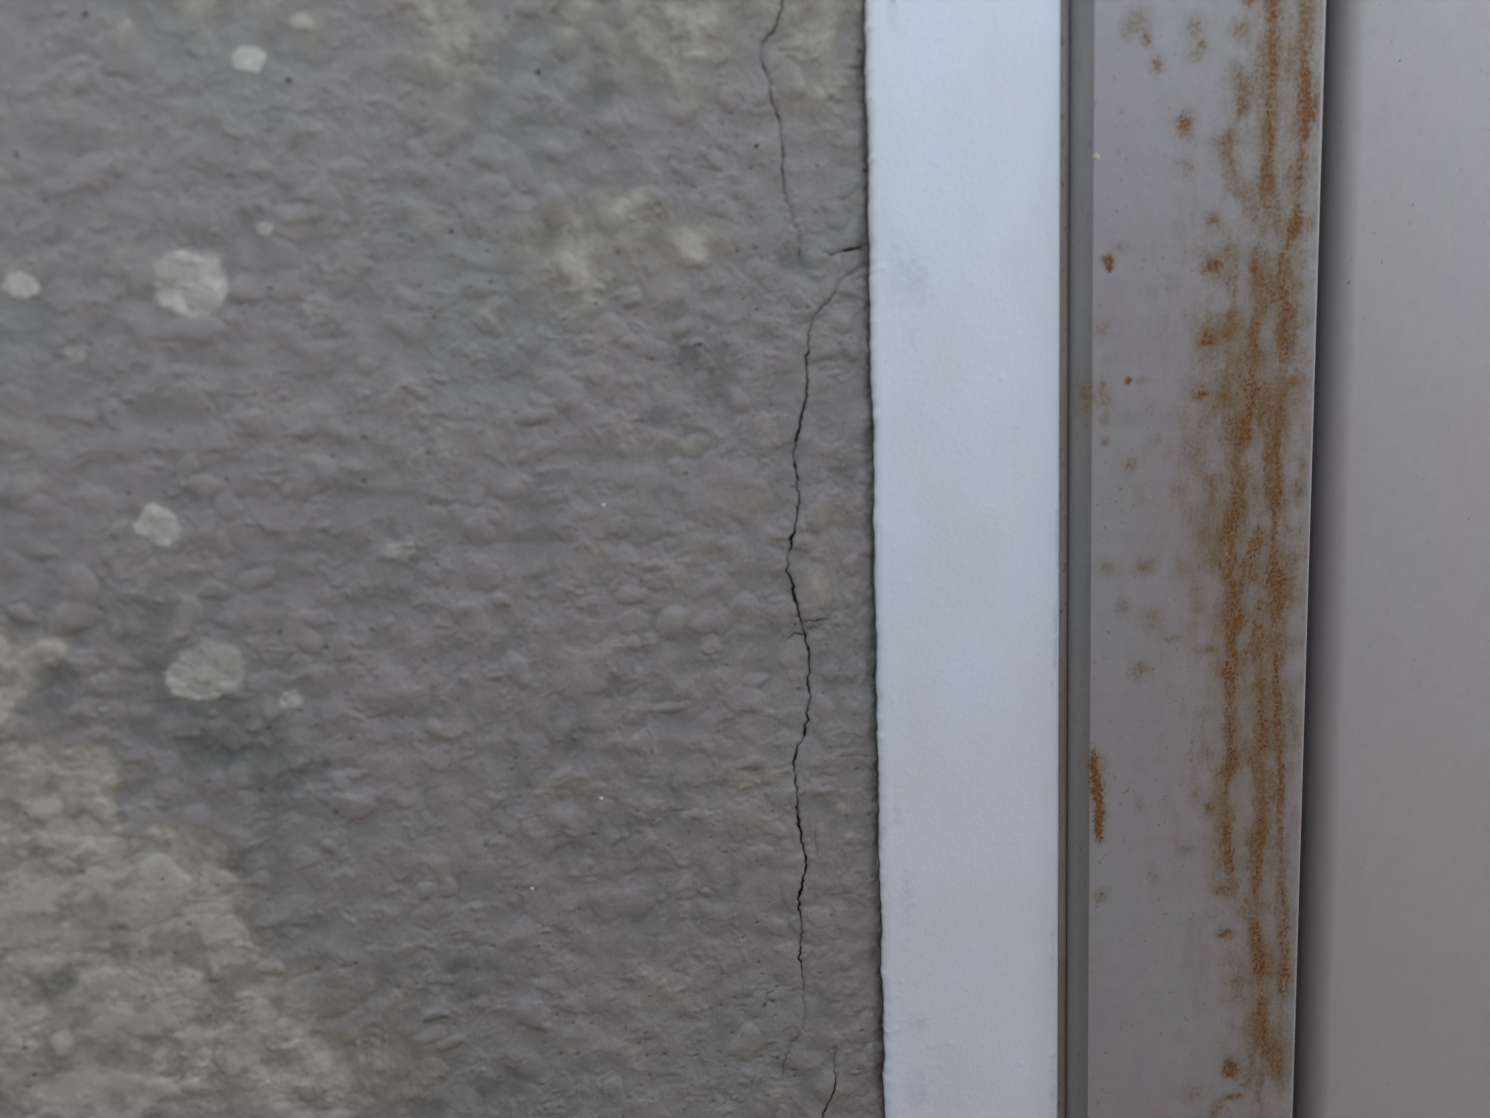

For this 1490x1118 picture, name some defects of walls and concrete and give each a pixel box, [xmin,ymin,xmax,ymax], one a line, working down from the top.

rust [1102,255,1114,272]
crack [760,0,866,1065]
rust [1193,0,1318,1113]
rust [1088,749,1106,842]
crack [822,1051,836,1118]